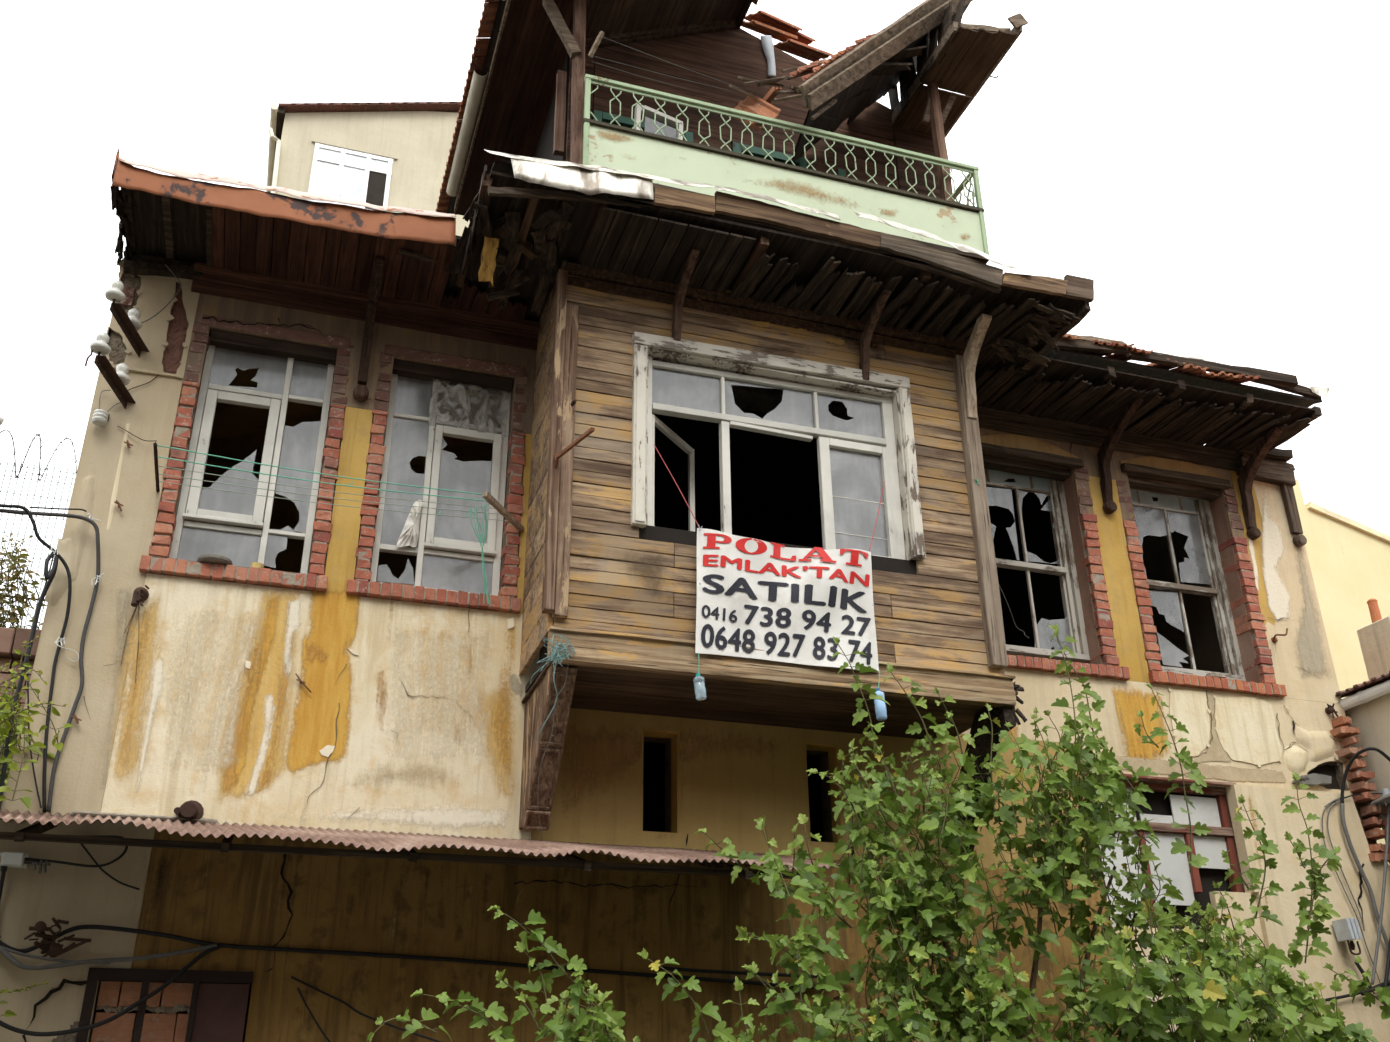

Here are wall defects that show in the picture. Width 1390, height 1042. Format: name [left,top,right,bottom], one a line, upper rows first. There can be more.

leakage [103,590,300,798]
crack [401,681,480,731]
leakage [376,634,522,793]
crack [1193,690,1218,758]
crack [1276,706,1309,756]
leakage [321,806,506,829]